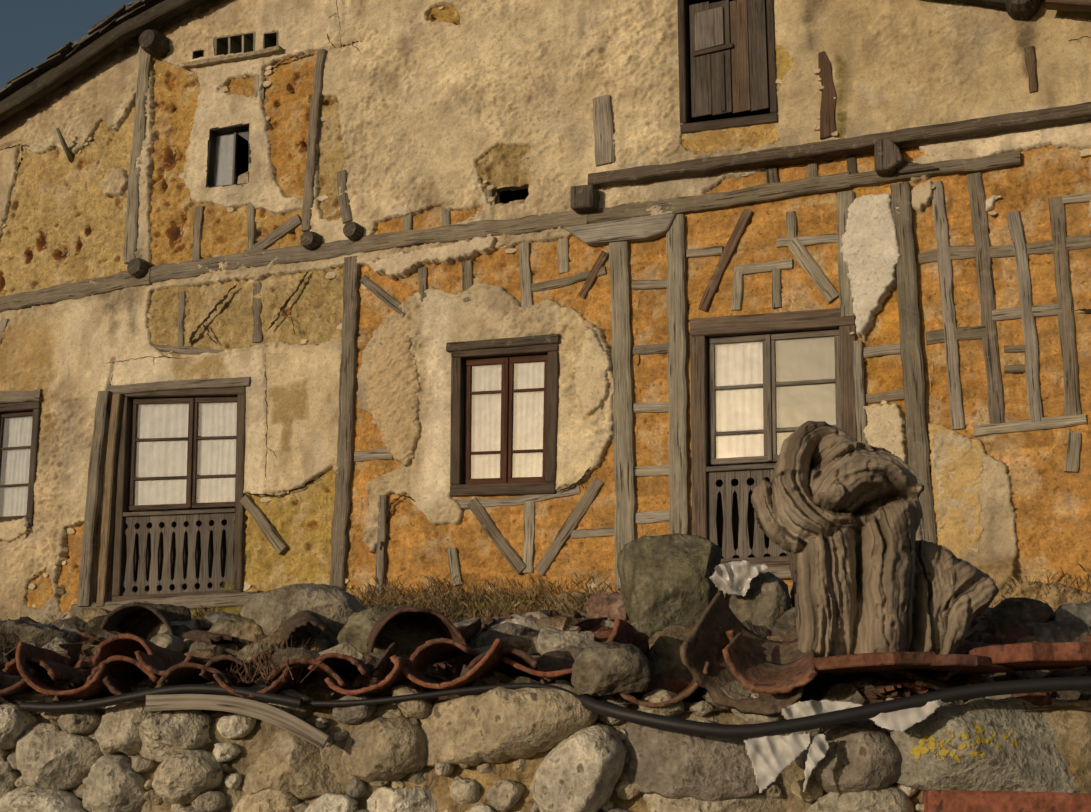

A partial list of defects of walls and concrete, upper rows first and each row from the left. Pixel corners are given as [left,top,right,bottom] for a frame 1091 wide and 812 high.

flaking render [427,5,461,25]
flaking render [0,106,135,297]
flaking render [149,50,346,267]
flaking render [374,144,534,234]
flaking render [147,267,343,357]
flaking render [345,234,620,603]
flaking render [629,236,670,539]
flaking render [684,145,1091,592]
flaking render [27,523,84,612]
flaking render [243,469,336,592]